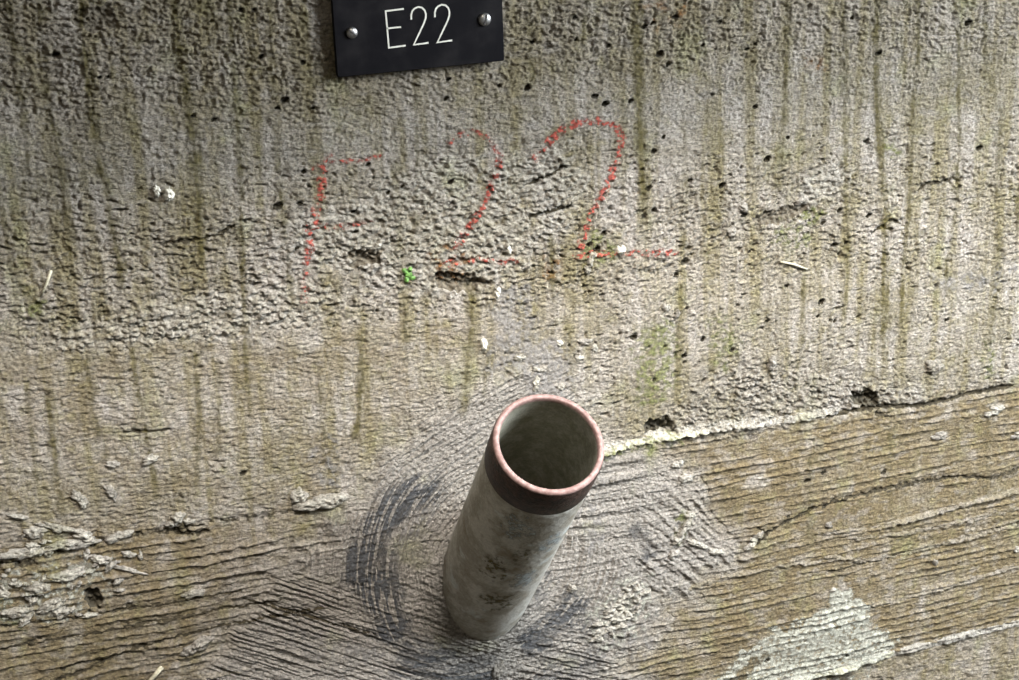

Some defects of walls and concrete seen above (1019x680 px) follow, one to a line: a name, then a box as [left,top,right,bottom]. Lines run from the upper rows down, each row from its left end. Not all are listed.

crack [756,467,1019,545]
peeling [0,513,149,628]
crack [828,550,910,571]